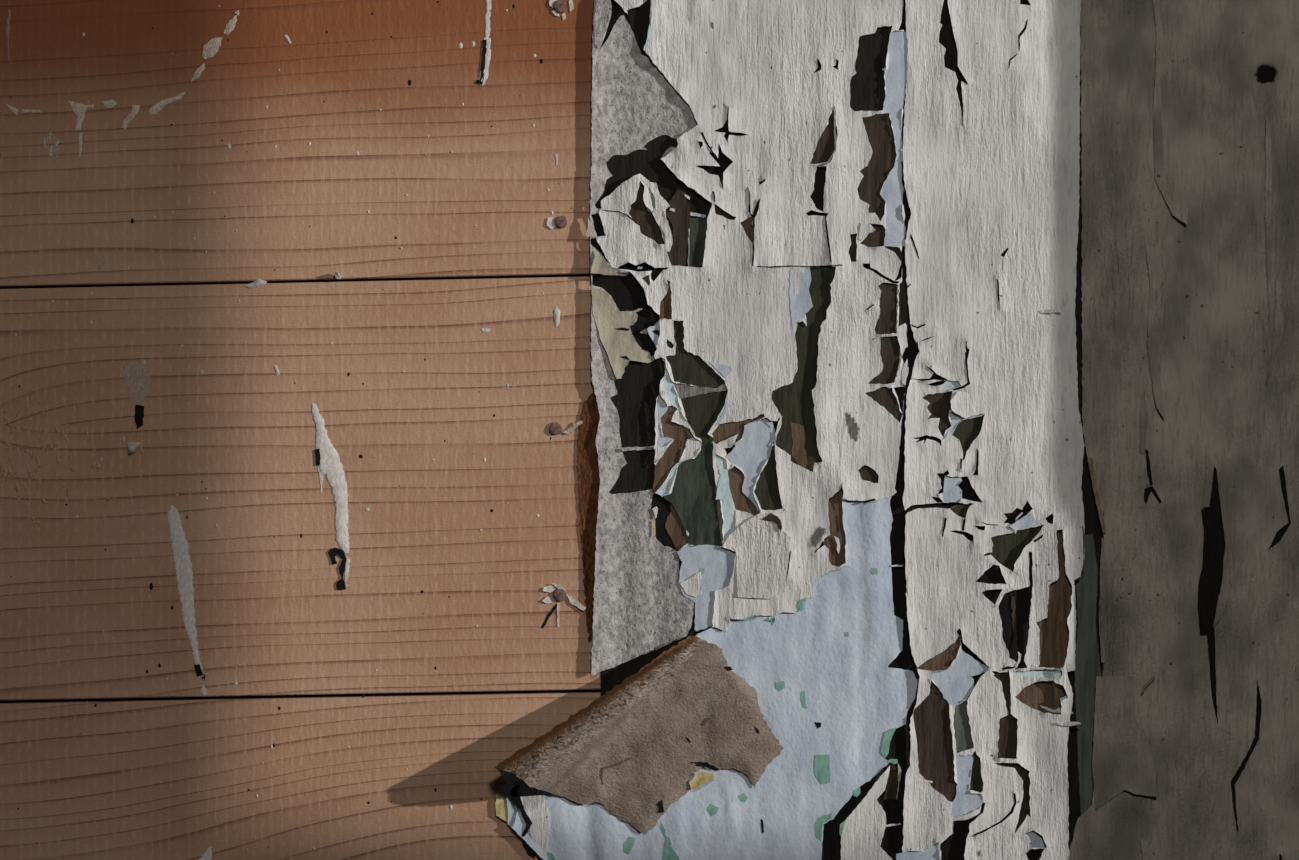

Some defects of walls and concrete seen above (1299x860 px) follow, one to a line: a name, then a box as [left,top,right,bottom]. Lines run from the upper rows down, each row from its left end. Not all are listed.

peeling [628,0,653,58]
peeling [810,26,908,262]
spalling [586,135,836,634]
peeling [846,413,858,441]
peeling [866,281,908,422]
spalling [923,349,985,460]
spalling [859,465,879,483]
peeling [811,487,846,567]
peeling [896,458,1157,860]
peeling [814,754,831,784]
peeling [661,822,680,860]
peeling [815,814,847,840]